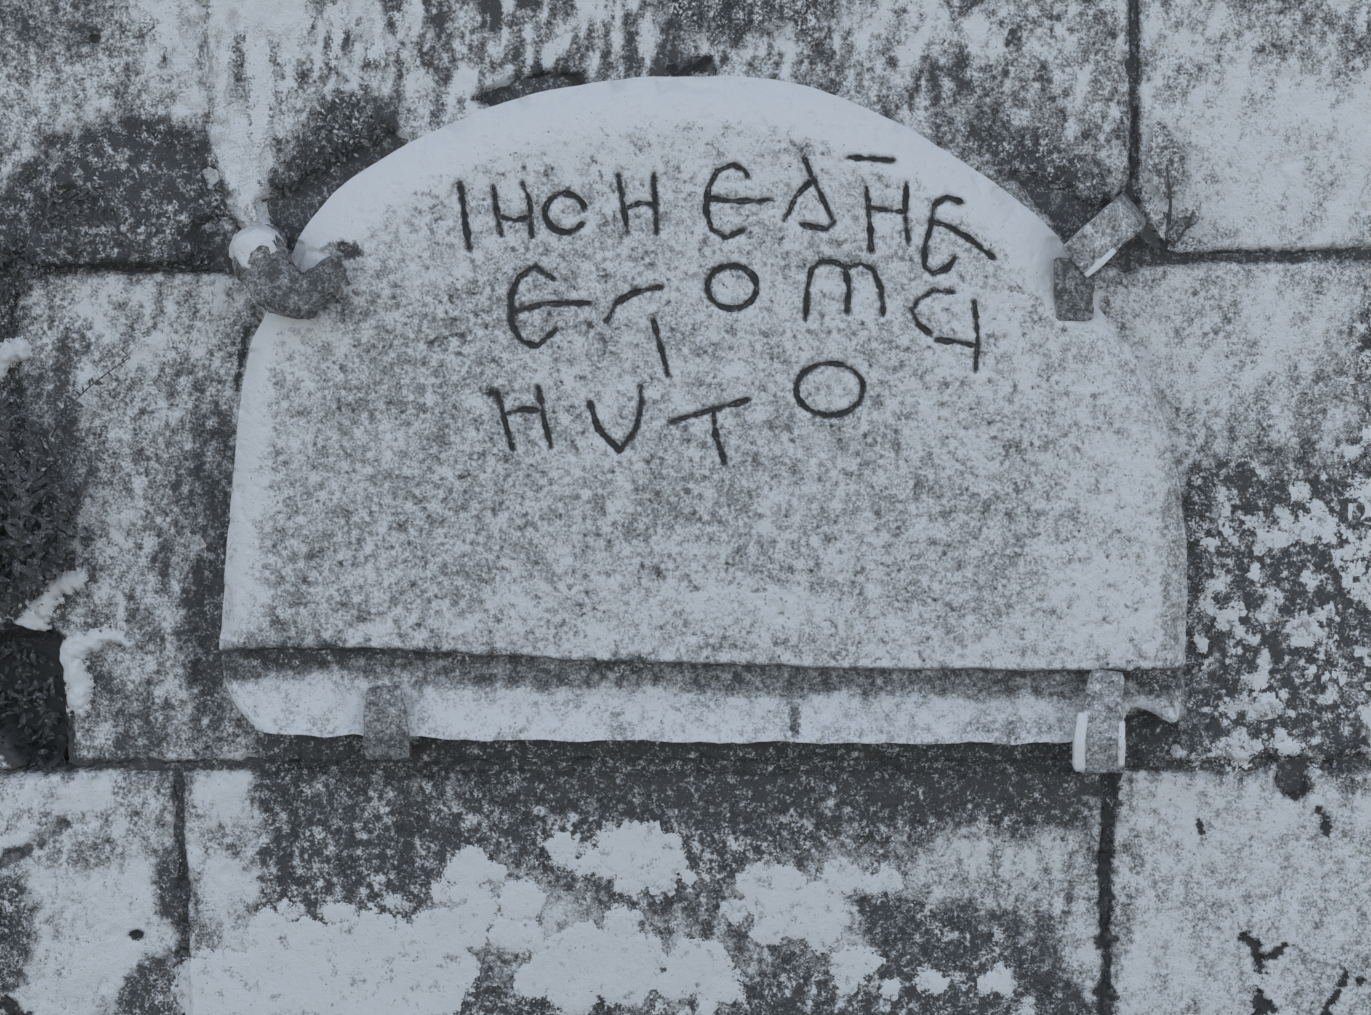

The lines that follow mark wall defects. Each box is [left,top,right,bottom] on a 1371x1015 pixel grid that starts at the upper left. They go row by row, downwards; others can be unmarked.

water stain [470,83,515,105]
water stain [521,58,586,86]
water stain [644,0,847,77]
water stain [932,104,1144,230]
water stain [187,279,1371,1015]